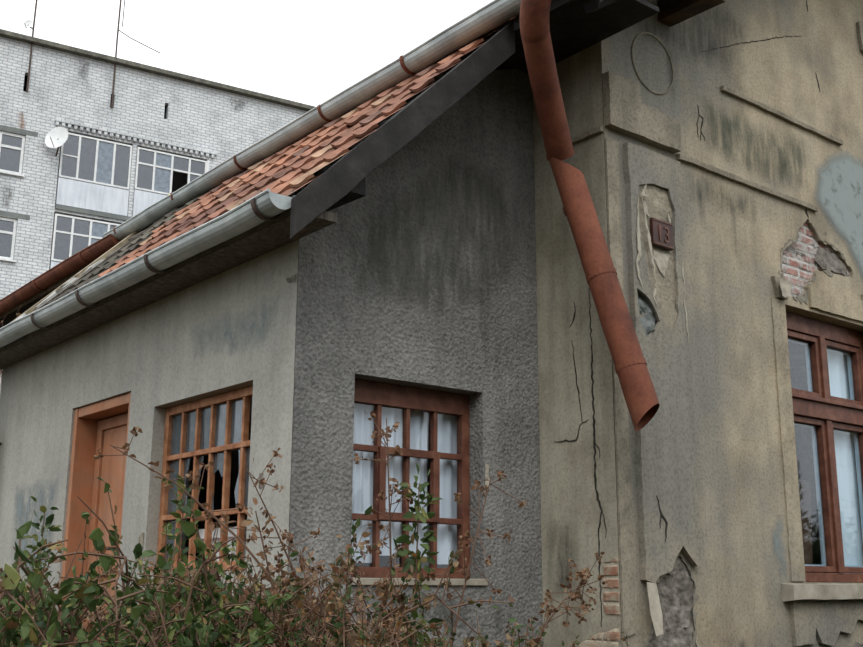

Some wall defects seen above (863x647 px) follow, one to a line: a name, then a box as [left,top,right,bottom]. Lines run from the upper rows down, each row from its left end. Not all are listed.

spalling [636,183,689,344]
spalling [778,209,850,304]
crack [554,287,606,627]
spalling [601,556,621,617]
spalling [643,555,700,647]